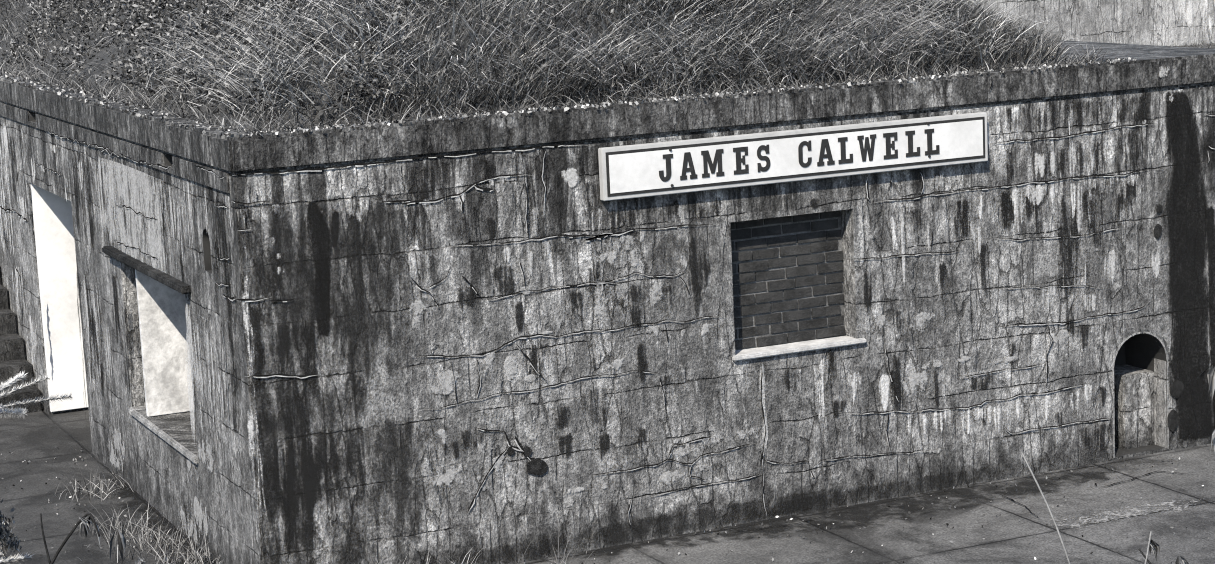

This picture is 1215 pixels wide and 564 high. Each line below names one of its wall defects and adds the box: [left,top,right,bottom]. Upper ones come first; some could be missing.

damp [0,126,44,373]
damp [494,247,523,331]
damp [562,168,636,250]
damp [891,203,930,283]
damp [954,196,988,298]
damp [987,95,1145,348]
damp [1151,91,1215,441]
damp [65,151,425,564]
damp [557,389,609,460]
damp [817,349,861,419]
damp [879,357,1020,435]
damp [586,465,1107,557]